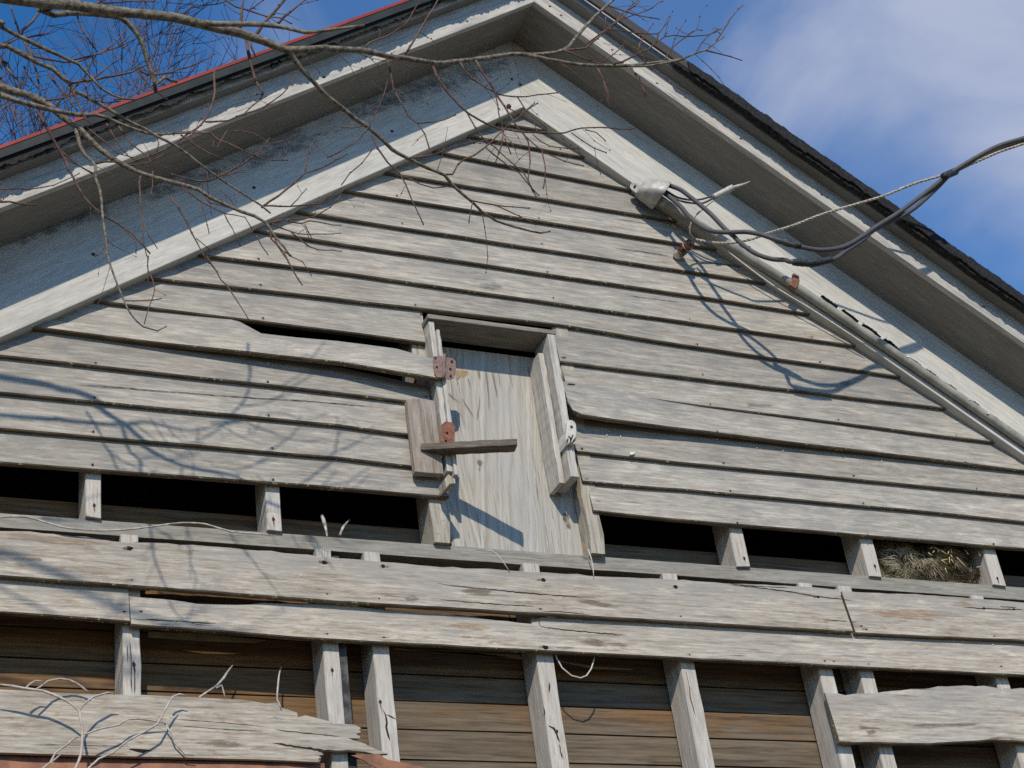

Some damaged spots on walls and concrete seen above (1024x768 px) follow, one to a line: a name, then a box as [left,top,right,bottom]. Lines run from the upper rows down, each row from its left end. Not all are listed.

peeling [821,294,957,390]